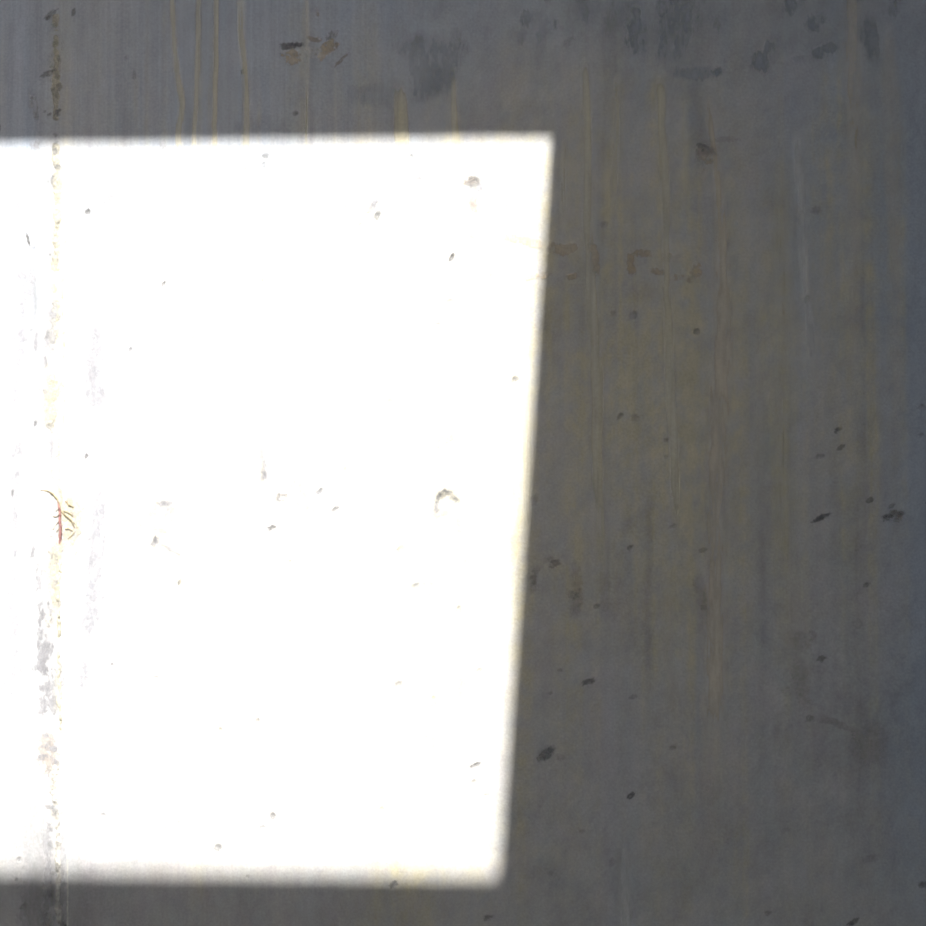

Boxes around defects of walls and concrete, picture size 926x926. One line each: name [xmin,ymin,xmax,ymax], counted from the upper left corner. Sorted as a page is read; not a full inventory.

spalling [279,31,339,65]
crack [34,331,49,367]